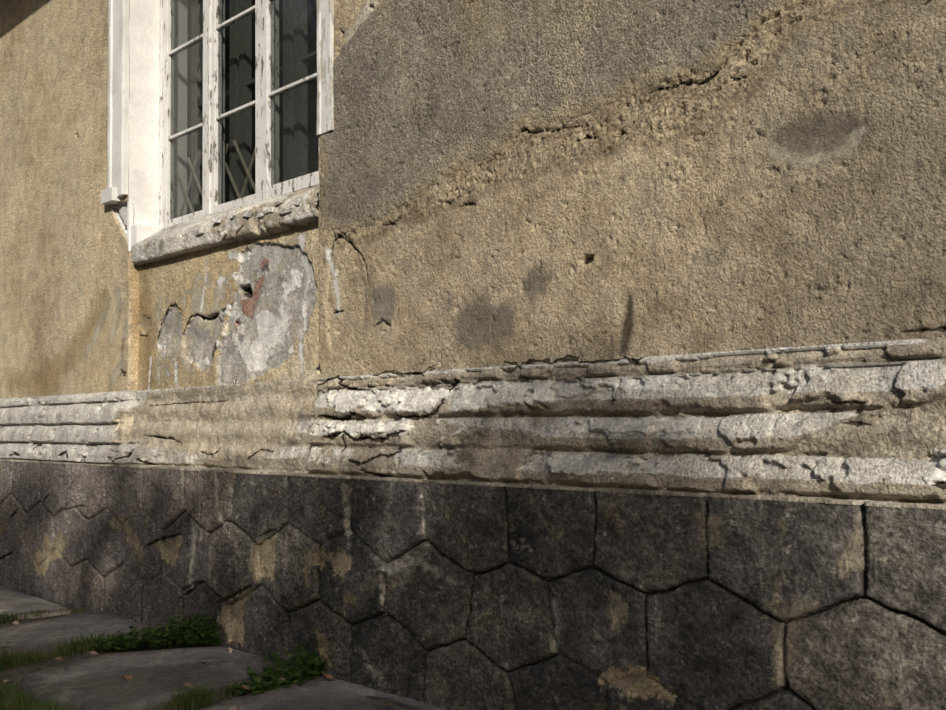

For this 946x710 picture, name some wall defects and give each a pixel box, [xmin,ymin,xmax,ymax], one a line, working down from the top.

flaking render [113,202,134,245]
peeling [195,198,303,237]
crack [331,234,371,288]
flaking render [140,239,317,385]
peeling [322,376,669,436]
peeling [565,415,702,435]
peeling [547,452,675,480]
peeling [922,447,946,485]